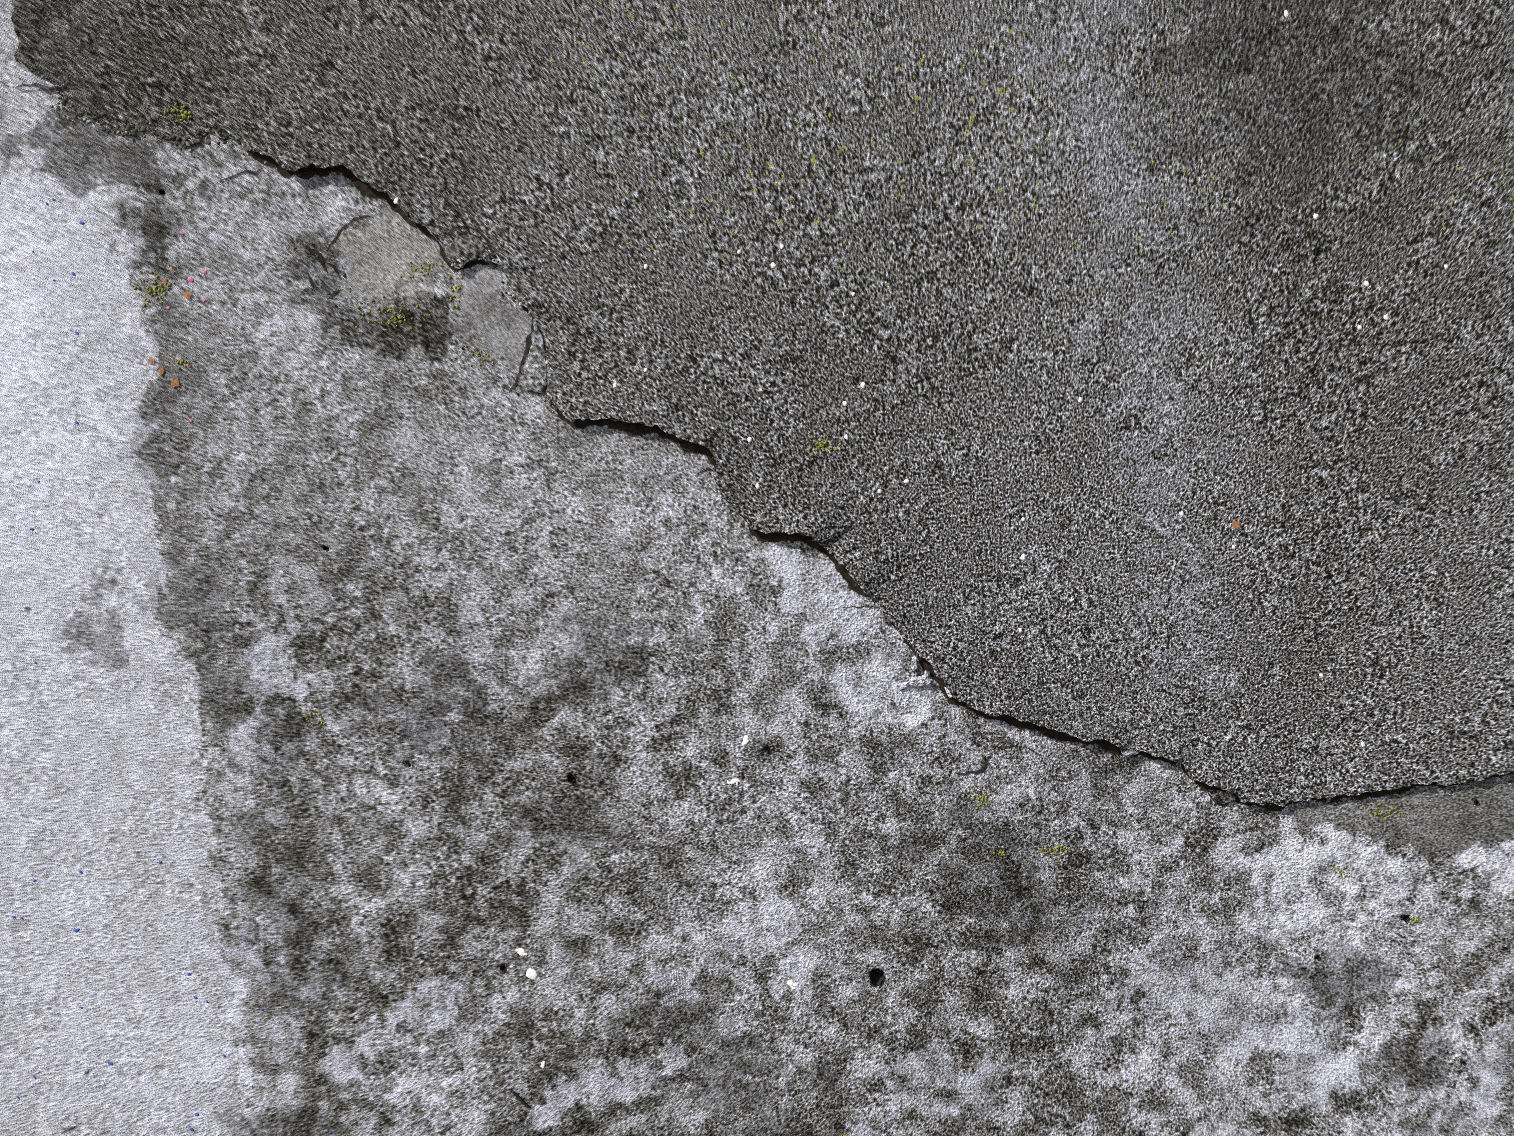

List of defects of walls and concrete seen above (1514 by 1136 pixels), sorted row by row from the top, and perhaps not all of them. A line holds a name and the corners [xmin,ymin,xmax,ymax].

crack [222,151,493,300]
mould [288,225,475,364]
crack [500,306,716,476]
peeling [11,0,1514,807]
damp [1009,0,1240,717]
damp [226,611,317,789]
damp [760,542,941,729]
crack [749,527,1514,812]
peeling [516,948,537,980]
damp [1110,774,1514,1112]
damp [492,1049,697,1136]
damp [872,1042,1010,1117]